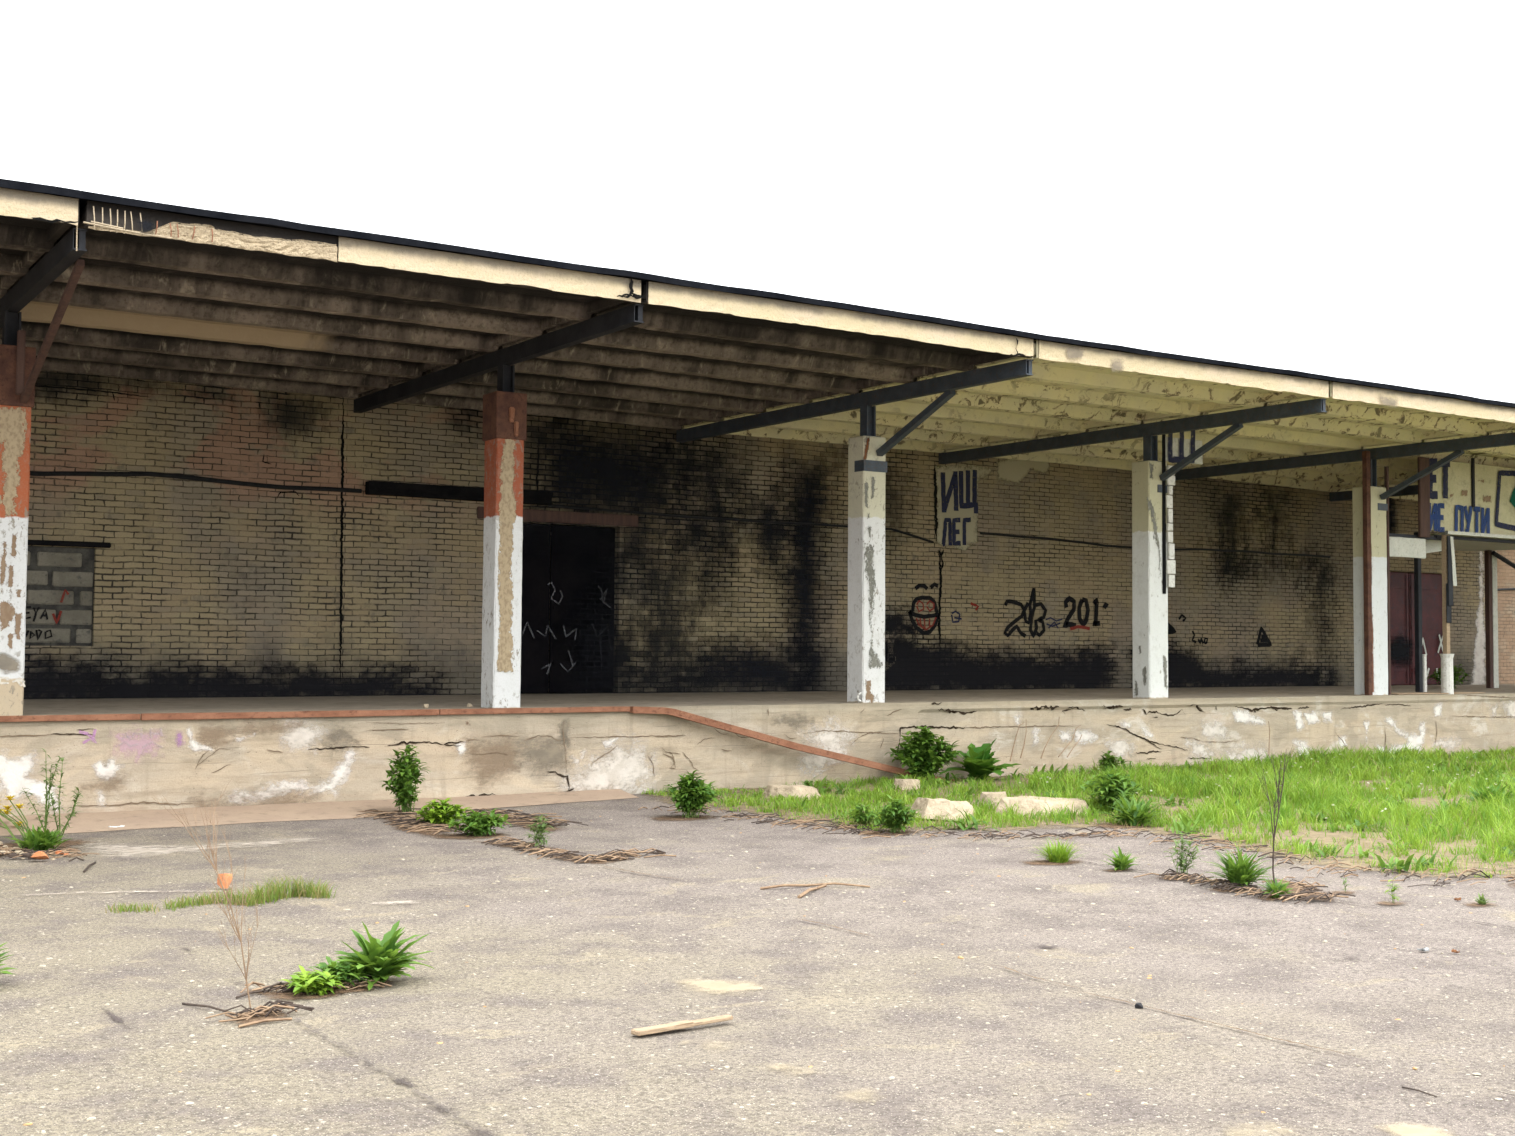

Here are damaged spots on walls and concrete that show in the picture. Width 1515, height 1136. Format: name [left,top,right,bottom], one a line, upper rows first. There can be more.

spalling [83,206,337,262]
peeling [0,406,28,649]
peeling [497,439,516,672]
leakage [672,435,792,612]
peeling [864,476,883,703]
leakage [0,648,451,699]
leakage [582,629,810,693]
leakage [93,760,118,802]
leakage [187,721,355,807]